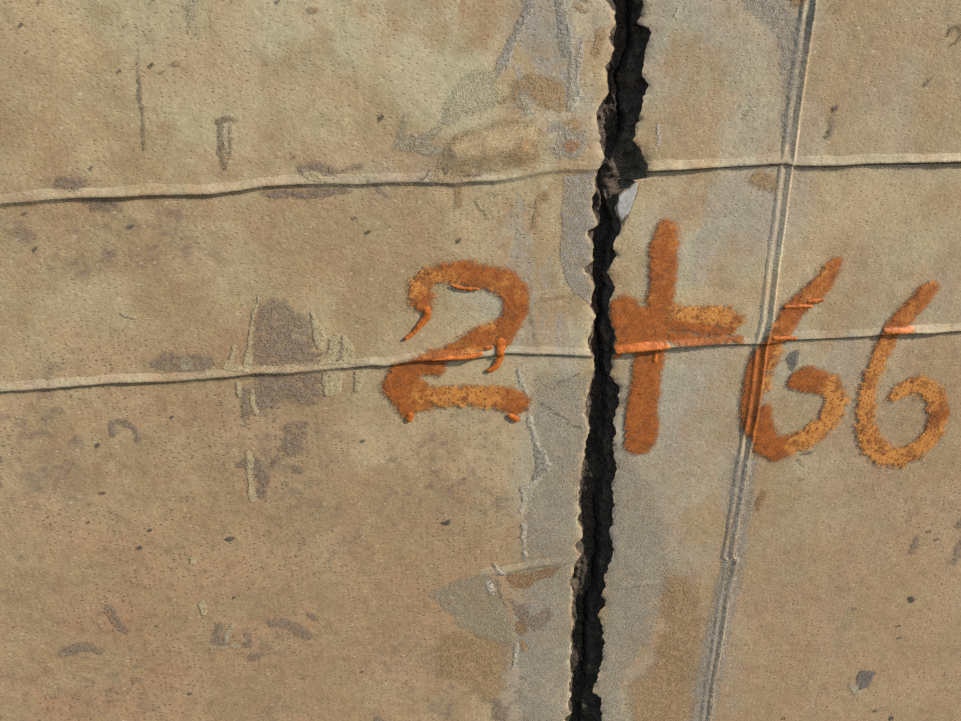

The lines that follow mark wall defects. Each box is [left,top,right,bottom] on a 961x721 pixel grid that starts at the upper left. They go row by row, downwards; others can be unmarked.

crack [450,0,961,721]